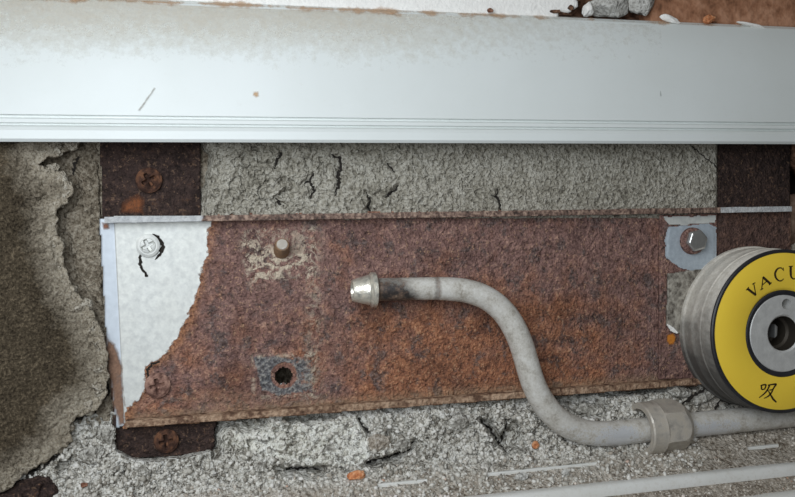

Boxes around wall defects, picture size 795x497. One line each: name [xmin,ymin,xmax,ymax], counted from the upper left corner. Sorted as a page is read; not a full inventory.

crack [304,173,316,199]
crack [331,154,342,196]
crack [366,163,398,211]
rust [717,211,791,256]
rust [106,210,700,429]
crack [366,441,414,464]
crack [480,420,507,452]